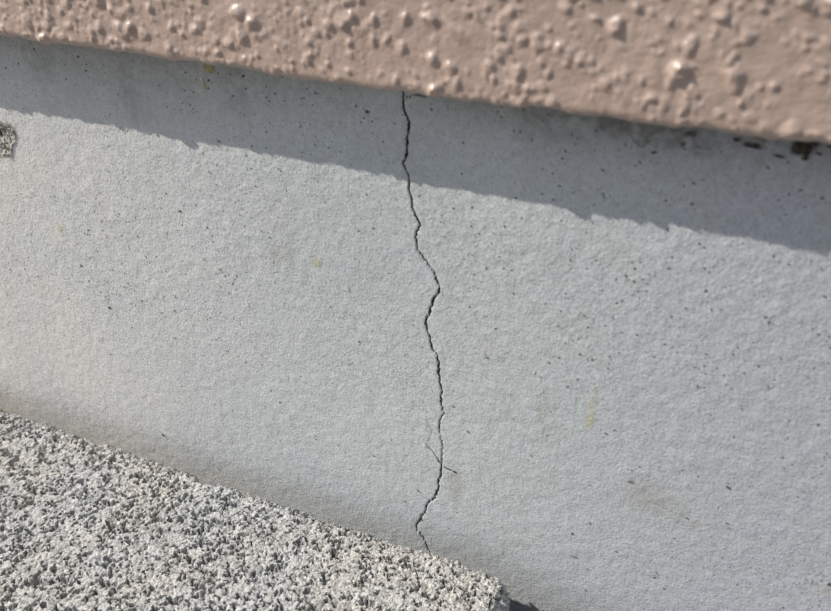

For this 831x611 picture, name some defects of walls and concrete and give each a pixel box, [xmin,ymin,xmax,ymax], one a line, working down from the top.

spalling [0,123,16,158]
crack [402,91,457,552]